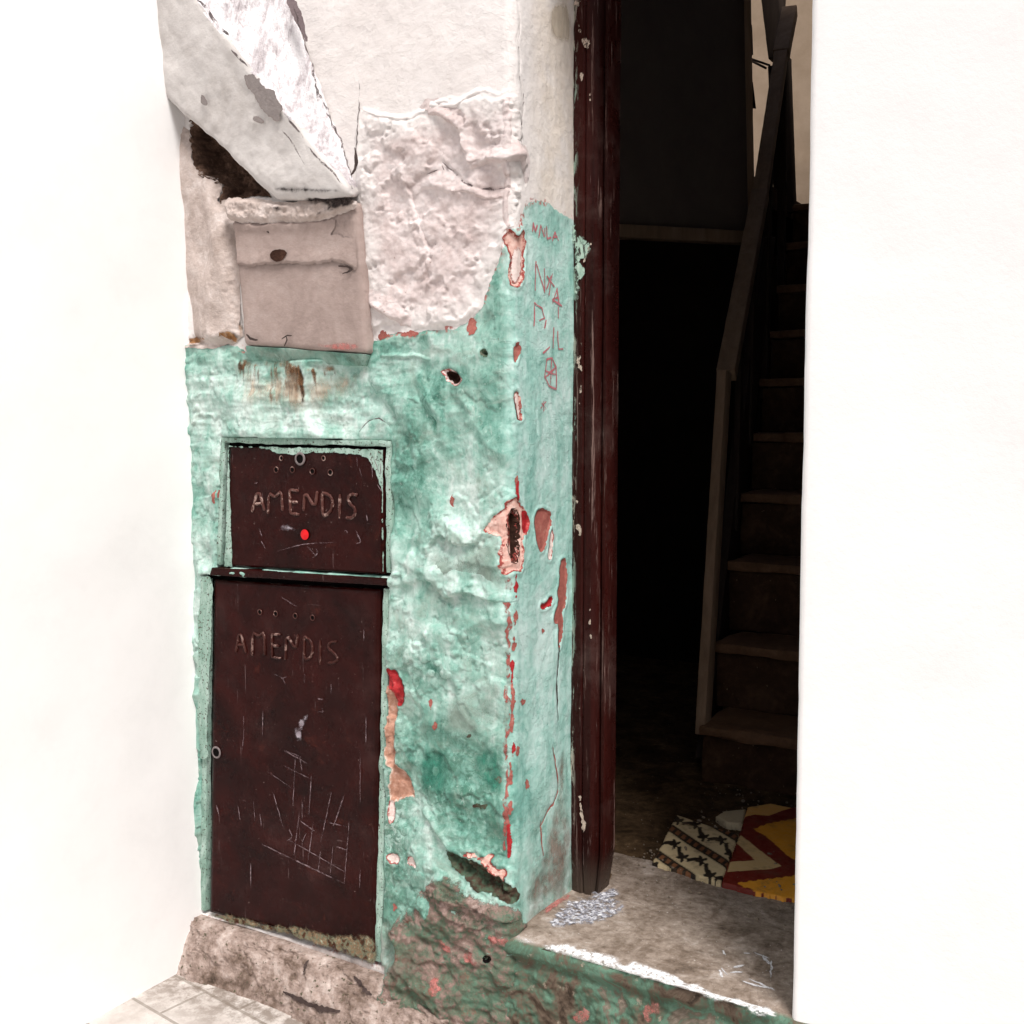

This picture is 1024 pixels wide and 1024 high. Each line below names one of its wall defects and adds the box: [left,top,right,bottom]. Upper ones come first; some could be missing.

spalling [287,0,308,42]
spalling [244,74,292,124]
peeling [350,85,530,340]
rust [244,361,333,403]
spalling [441,369,462,386]
spalling [376,475,568,1024]